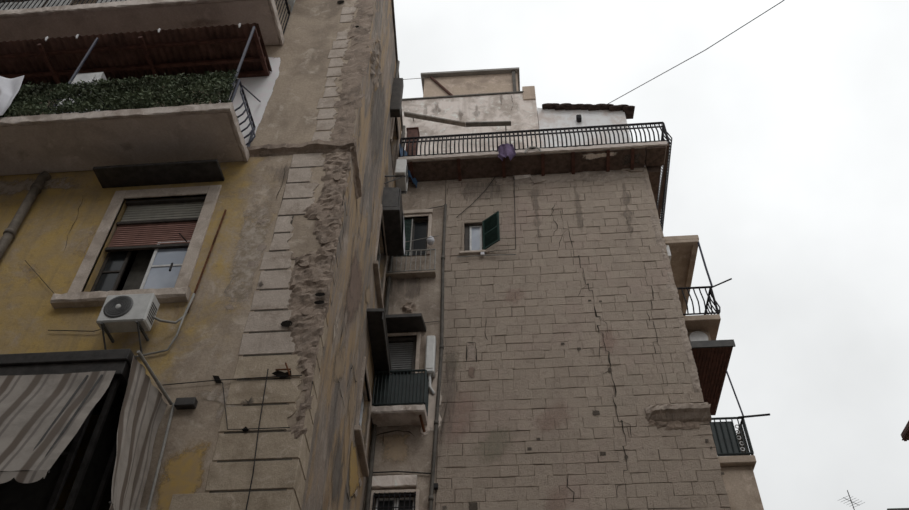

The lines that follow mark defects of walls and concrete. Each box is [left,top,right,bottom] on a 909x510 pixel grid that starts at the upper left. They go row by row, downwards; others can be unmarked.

spalling [272,0,377,439]
crack [548,201,632,505]